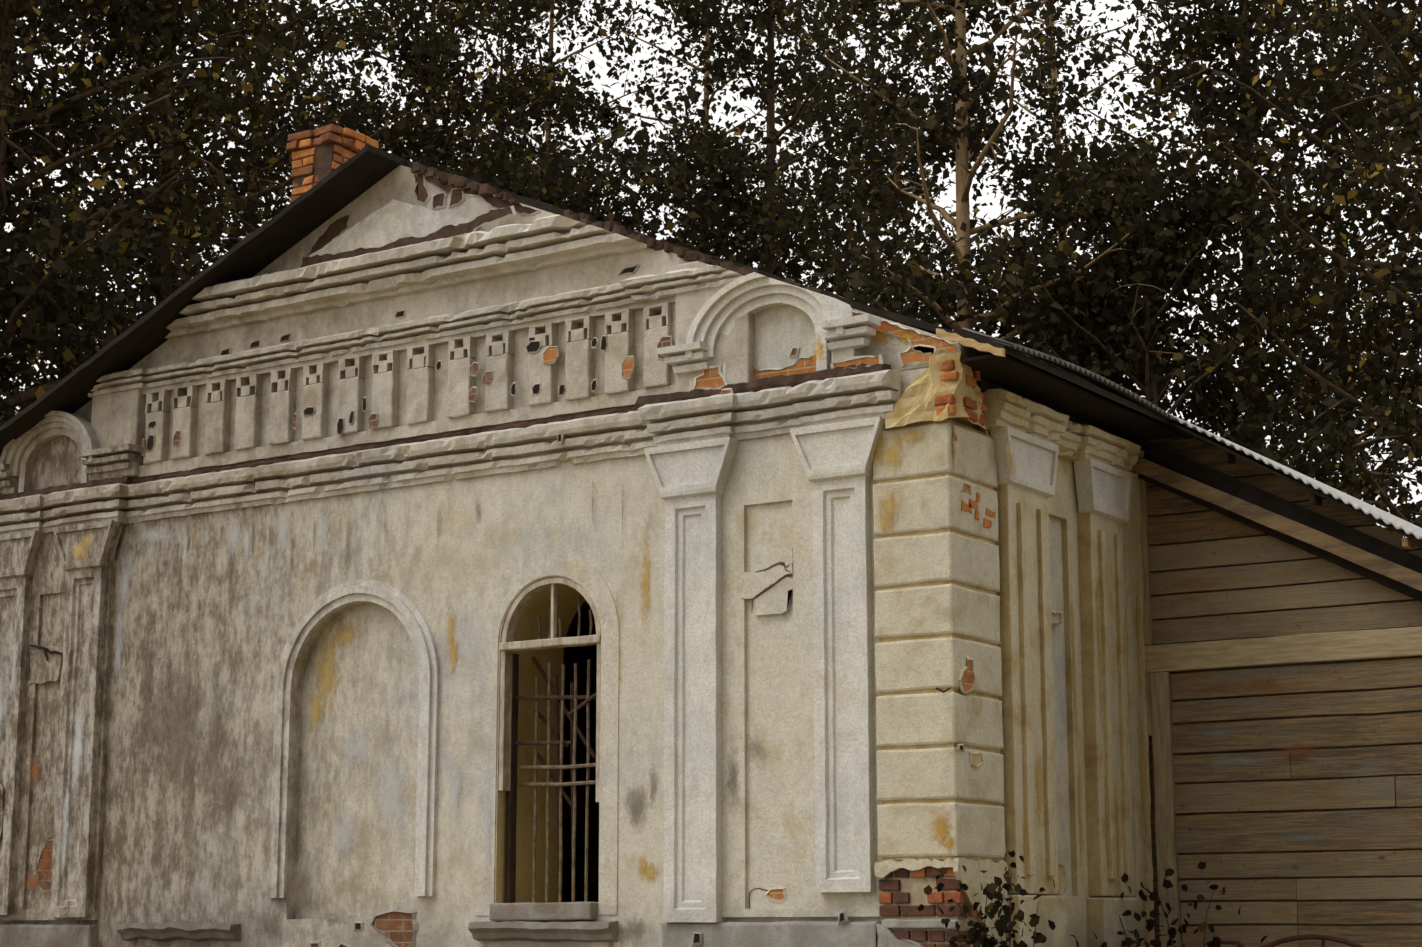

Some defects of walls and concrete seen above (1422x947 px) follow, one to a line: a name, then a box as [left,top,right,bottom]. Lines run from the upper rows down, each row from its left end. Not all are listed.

flaking render [298,168,541,268]
flaking render [693,365,733,395]
spalling [753,311,988,436]
flaking render [961,482,996,528]
flaking render [742,548,793,616]
flaking render [958,656,976,694]
flaking render [310,906,419,947]
spalling [874,858,1009,947]